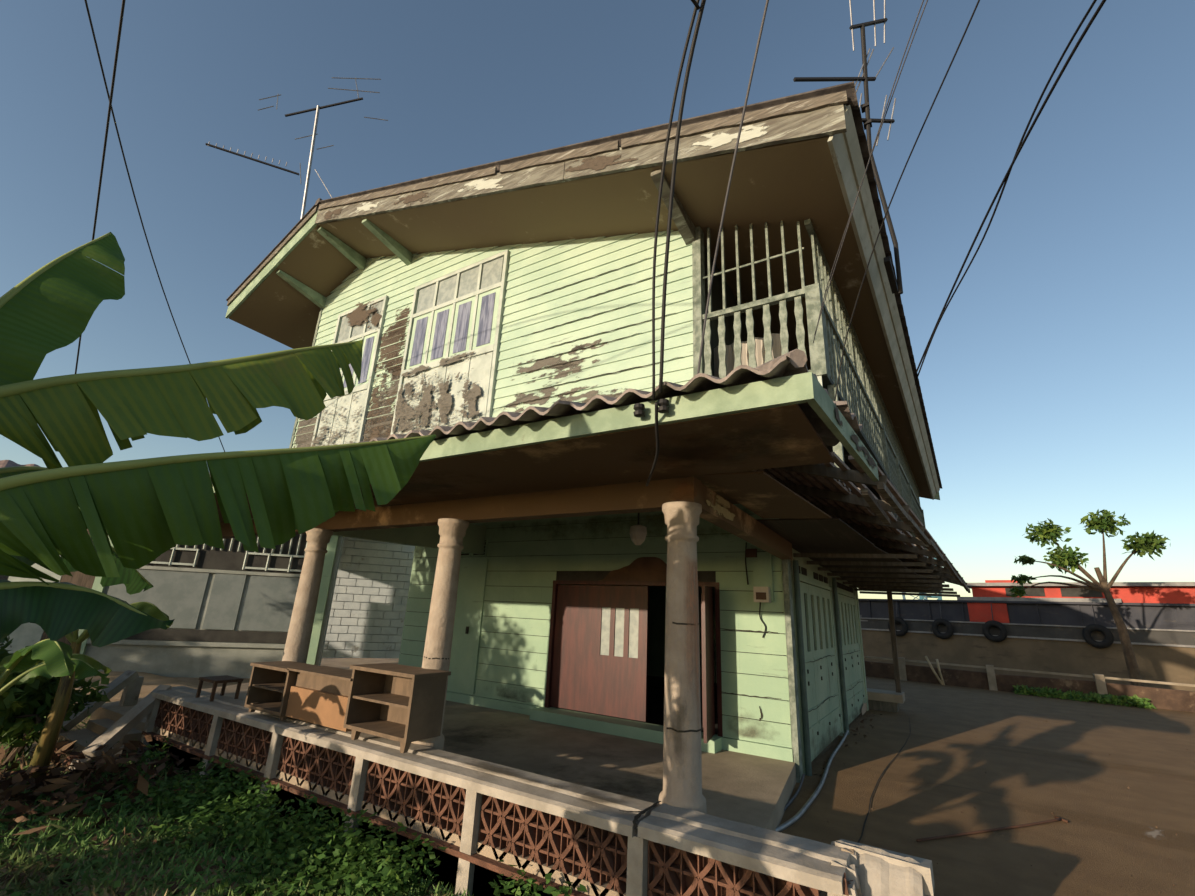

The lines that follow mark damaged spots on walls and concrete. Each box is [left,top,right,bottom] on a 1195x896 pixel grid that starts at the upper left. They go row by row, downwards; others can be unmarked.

peeling [692,125,769,149]
peeling [565,155,637,172]
peeling [458,177,509,193]
peeling [322,202,379,219]
peeling [293,301,482,448]
peeling [504,339,627,412]